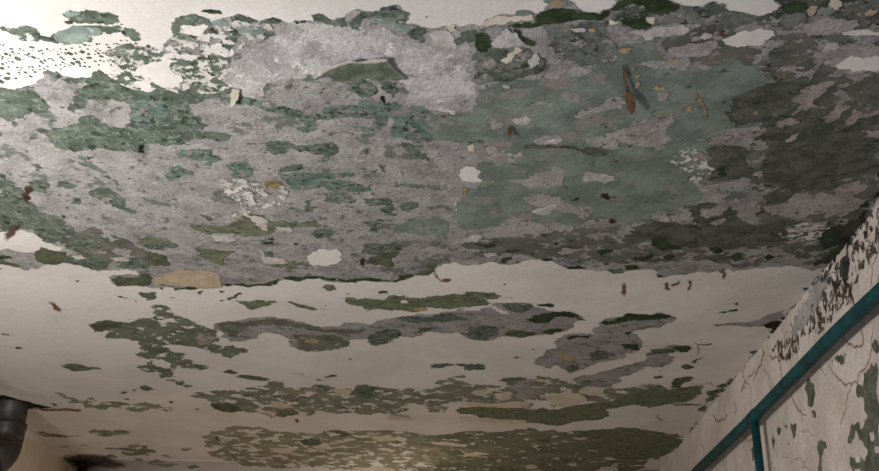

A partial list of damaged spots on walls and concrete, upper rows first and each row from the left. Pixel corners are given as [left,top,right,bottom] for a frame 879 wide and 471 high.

peeling [0,0,879,363]
crack [842,232,879,305]
peeling [61,363,101,372]
peeling [88,291,736,471]
crack [713,323,815,471]
peeling [772,422,796,449]
peeling [805,377,816,418]
peeling [817,440,827,471]
crack [817,330,873,423]
peeling [848,339,879,471]